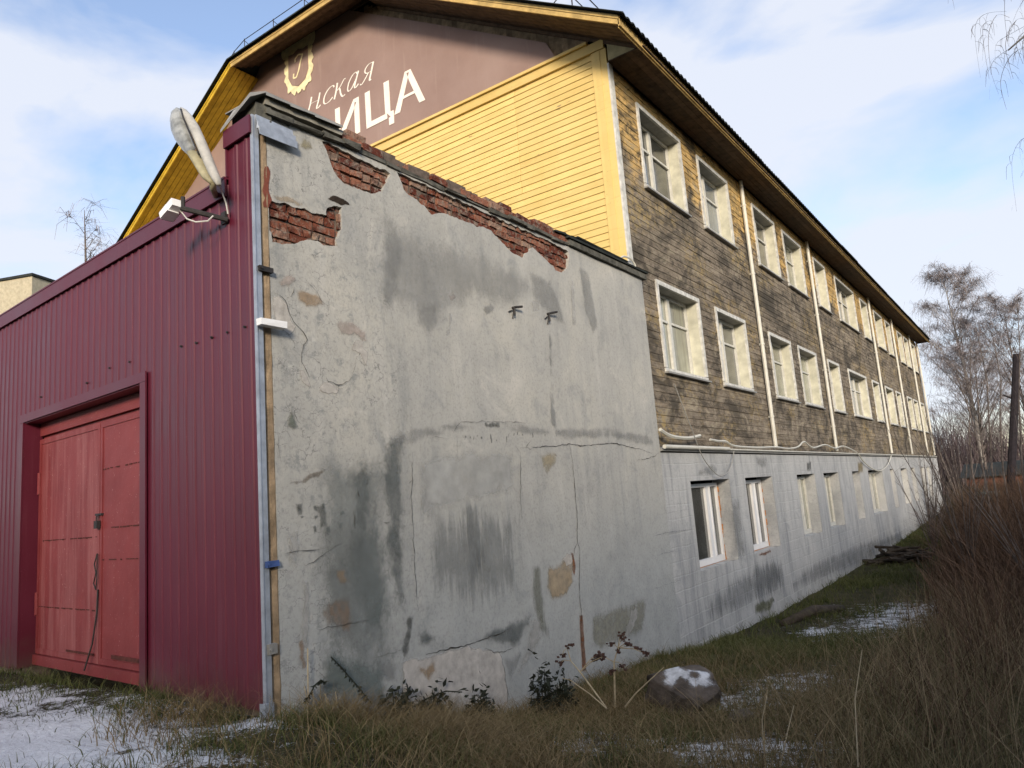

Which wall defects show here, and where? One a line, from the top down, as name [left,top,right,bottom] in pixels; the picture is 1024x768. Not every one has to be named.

spalling [263,166,349,246]
spalling [302,140,568,272]
crack [281,291,357,388]
leakage [298,472,383,649]
leakage [386,442,401,578]
peeling [548,554,572,597]
crack [494,421,654,660]
leakage [323,656,383,700]
leakage [403,618,431,653]
peeling [402,646,508,715]
crack [426,629,512,694]